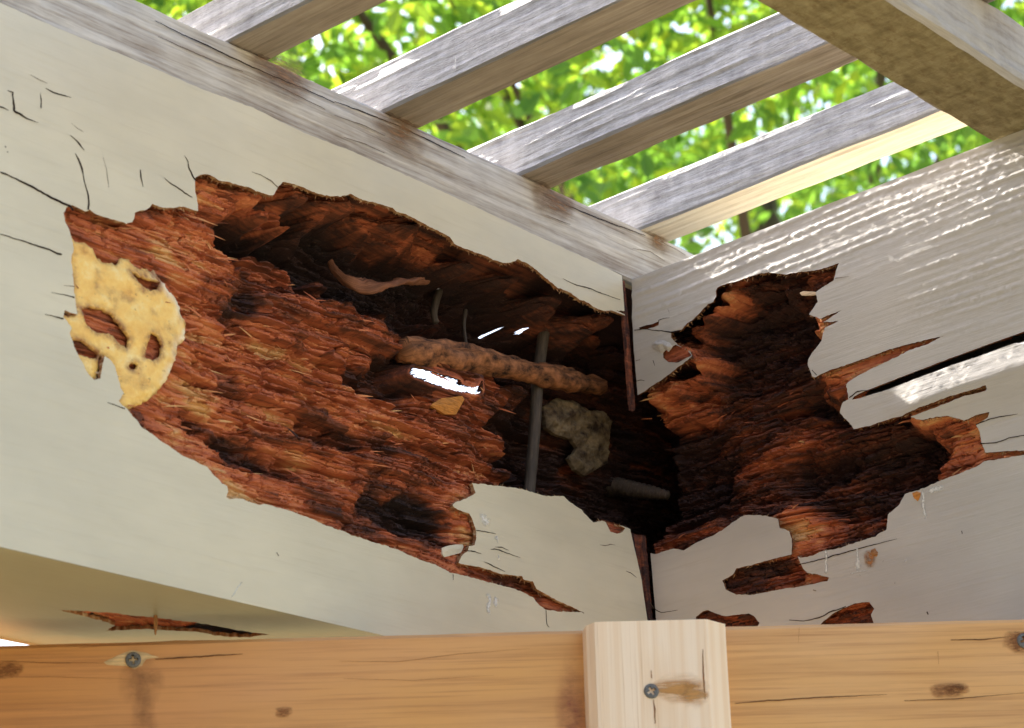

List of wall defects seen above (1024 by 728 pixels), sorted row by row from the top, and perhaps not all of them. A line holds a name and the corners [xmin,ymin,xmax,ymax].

crack [0,75,71,123]
crack [0,126,109,211]
crack [140,155,195,198]
crack [0,234,62,255]
spalling [64,175,1024,620]
peeling [698,611,760,627]
spalling [824,602,874,624]